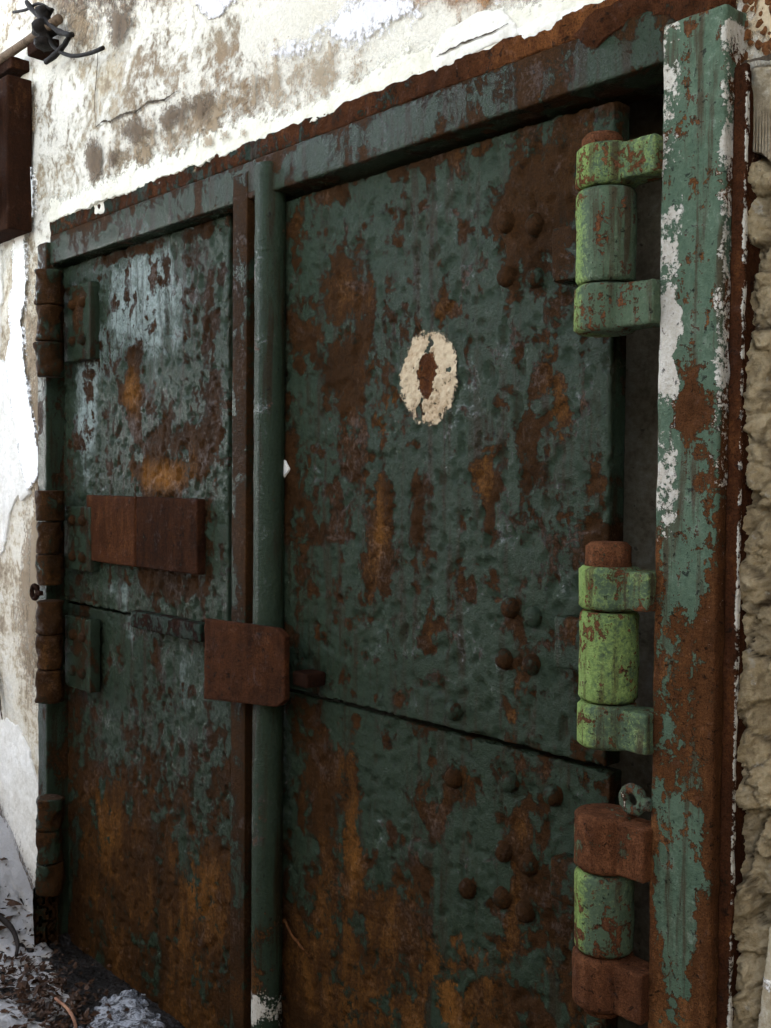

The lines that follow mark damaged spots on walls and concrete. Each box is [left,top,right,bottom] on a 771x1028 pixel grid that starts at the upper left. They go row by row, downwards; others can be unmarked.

crack [94,53,181,127]
damp [109,30,372,174]
flaking render [30,0,604,223]
corrosion [448,0,490,14]
corrosion [572,0,771,61]
flaking render [0,234,38,556]
spalling [732,156,771,1028]
flaking render [0,713,38,887]